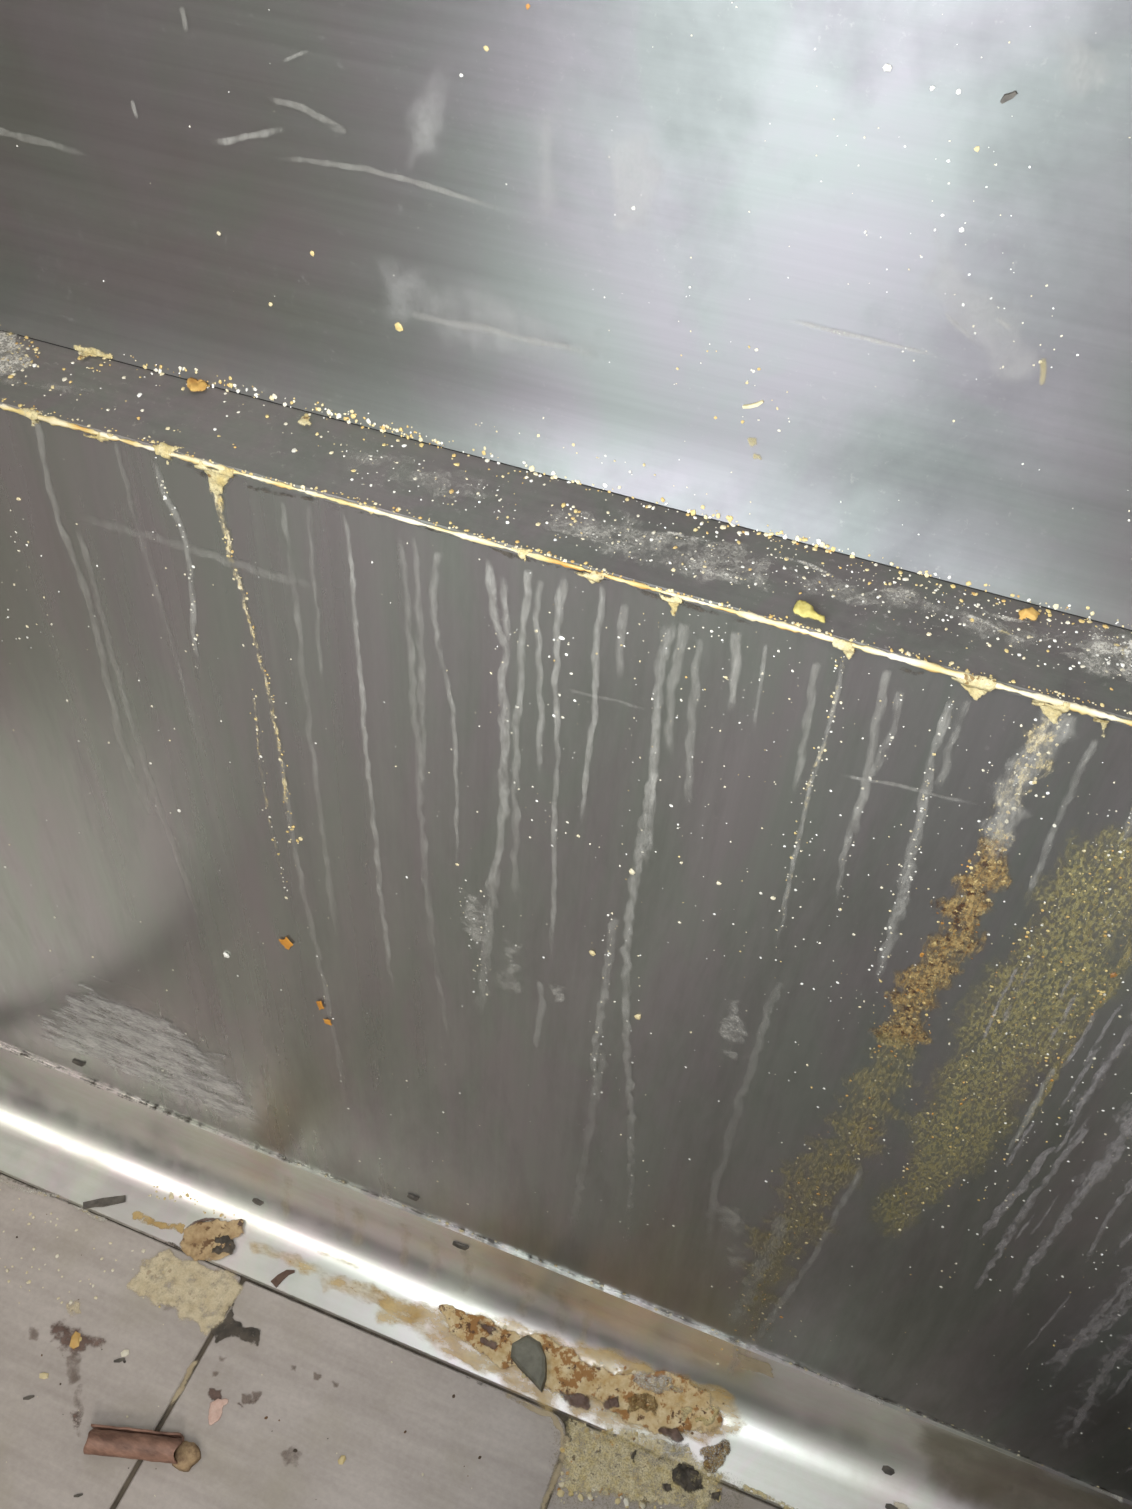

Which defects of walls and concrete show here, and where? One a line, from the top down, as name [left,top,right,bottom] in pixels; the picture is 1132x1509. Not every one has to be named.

rust [707,697,1071,1373]
leakage [1048,1004,1126,1104]
leakage [980,1108,1132,1291]